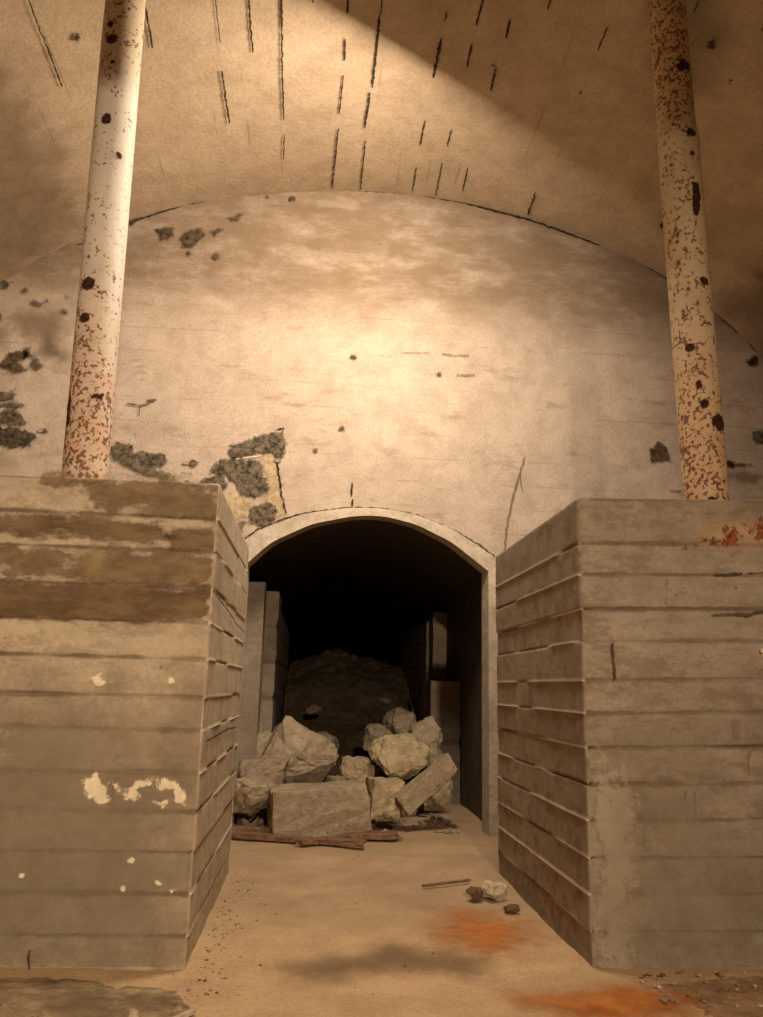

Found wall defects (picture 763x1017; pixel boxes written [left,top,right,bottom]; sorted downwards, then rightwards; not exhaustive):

crack [247,0,255,53]
crack [278,0,286,159]
crack [332,39,346,188]
crack [360,1,382,192]
crack [401,120,599,245]
peeling [0,346,43,374]
peeling [0,388,47,449]
peeling [111,432,288,533]
crack [206,455,524,557]
peeling [649,441,670,462]
corrosion [684,516,763,550]
peeling [752,431,763,444]